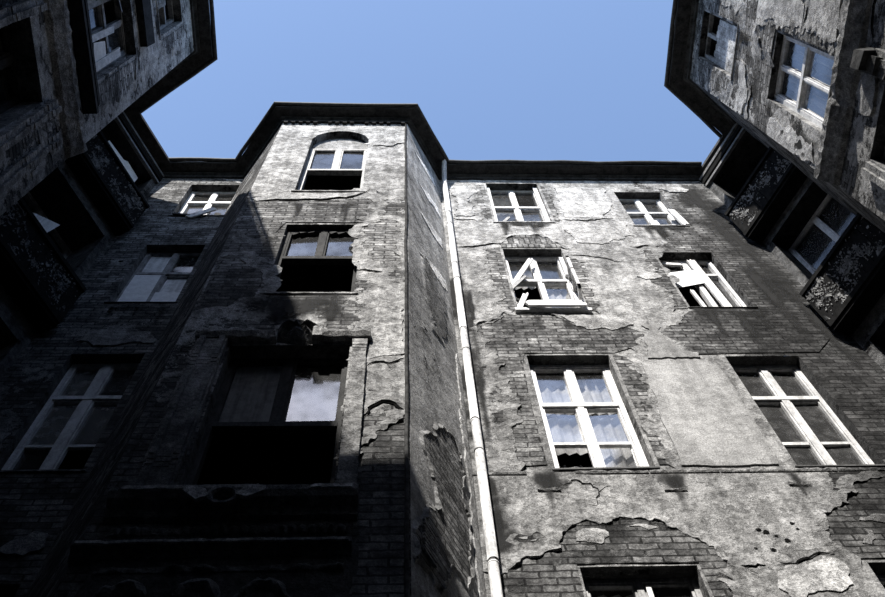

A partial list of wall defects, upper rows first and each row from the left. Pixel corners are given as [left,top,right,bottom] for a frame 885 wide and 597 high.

flaking render [703,0,835,67]
flaking render [695,55,733,101]
flaking render [158,216,220,228]
flaking render [190,197,405,318]
crack [454,216,501,247]
crack [567,242,649,262]
flaking render [467,217,885,472]
flaking render [352,408,488,597]
crack [556,467,611,505]
flaking render [498,510,751,597]
flaking render [742,470,885,571]